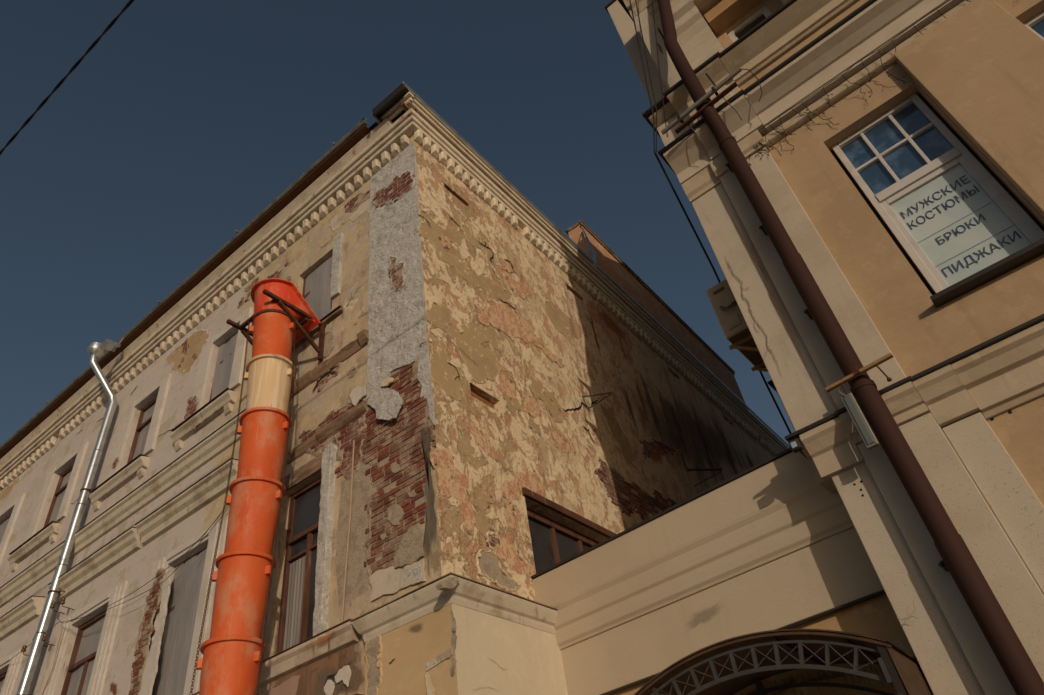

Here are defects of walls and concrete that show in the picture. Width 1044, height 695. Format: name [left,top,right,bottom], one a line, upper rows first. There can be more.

flaking render [328,170,416,232]
flaking render [166,329,210,376]
flaking render [296,206,579,601]
flaking render [594,404,677,521]
flaking render [128,567,172,695]
flaking render [266,675,300,695]
flaking render [324,665,351,695]